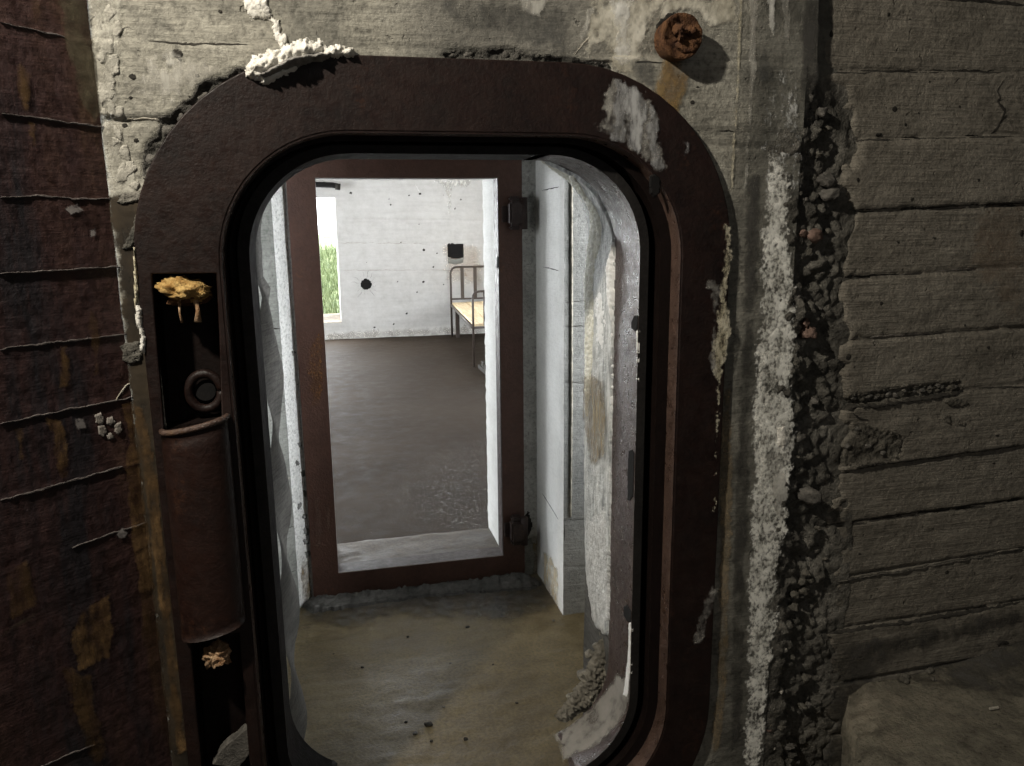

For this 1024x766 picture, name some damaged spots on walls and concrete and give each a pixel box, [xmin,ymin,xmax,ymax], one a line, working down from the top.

peeling [91,0,246,204]
water stain [243,0,357,85]
corrosion [656,22,699,109]
water stain [541,161,616,635]
water stain [712,227,732,432]
water stain [732,144,798,766]
spalling [760,74,902,766]
spalling [554,632,606,723]